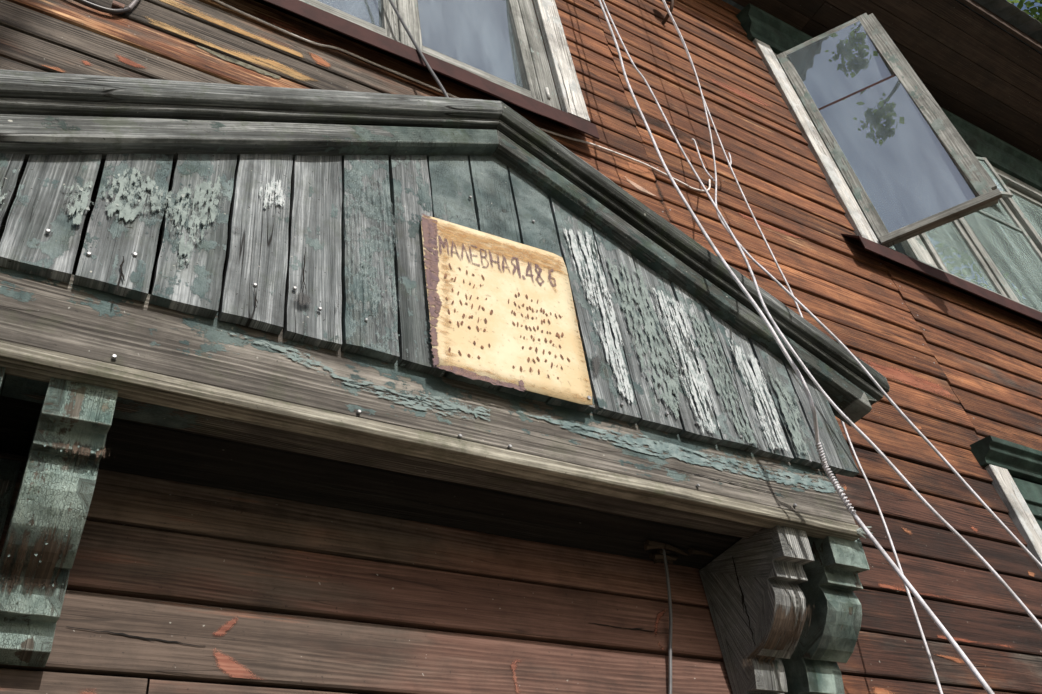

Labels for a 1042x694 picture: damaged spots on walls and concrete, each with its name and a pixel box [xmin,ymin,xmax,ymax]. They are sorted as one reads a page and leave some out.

peeling [117,55,145,68]
peeling [145,16,317,81]
peeling [161,0,362,67]
peeling [62,167,226,267]
peeling [259,180,285,209]
peeling [230,333,491,421]
peeling [563,228,807,456]
peeling [44,441,106,468]
peeling [521,411,847,493]
peeling [1,526,71,599]
crack [732,557,755,644]